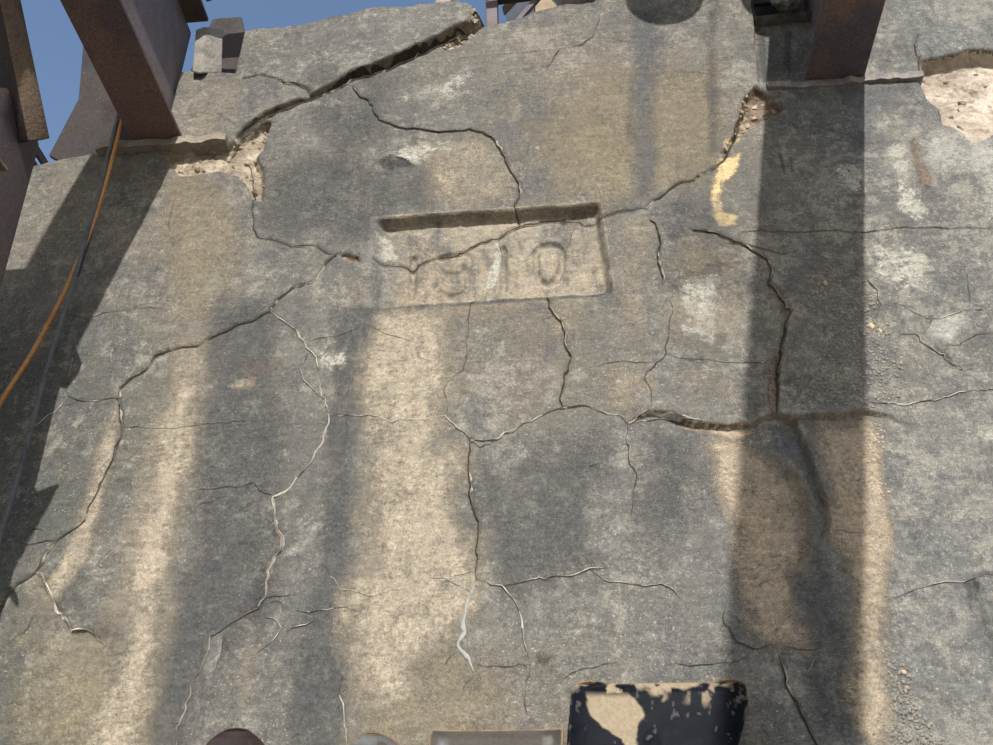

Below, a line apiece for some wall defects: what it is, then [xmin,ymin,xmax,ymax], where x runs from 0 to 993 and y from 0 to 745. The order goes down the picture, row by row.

spalling [163,122,270,201]
spalling [711,87,783,227]
spalling [920,50,993,143]
crack [0,18,741,745]
crack [692,217,993,416]
water stain [709,439,811,652]
water stain [818,417,894,745]
crack [895,574,989,598]
crack [676,606,846,745]